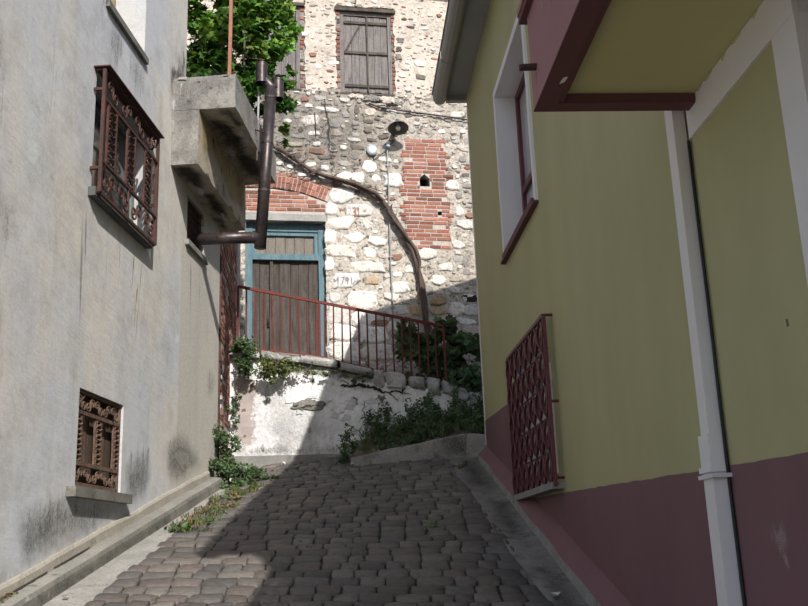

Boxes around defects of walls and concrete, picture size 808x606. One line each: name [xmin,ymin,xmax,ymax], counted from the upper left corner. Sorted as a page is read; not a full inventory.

damp [176,167,227,229]
peeling [284,394,395,447]
crack [338,379,411,437]